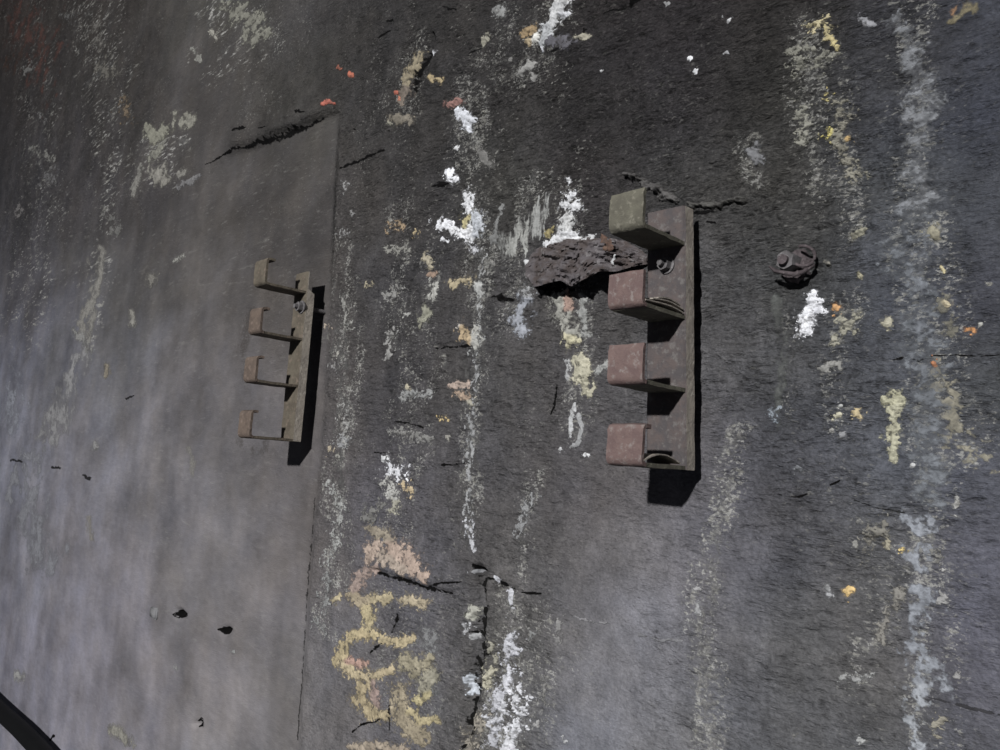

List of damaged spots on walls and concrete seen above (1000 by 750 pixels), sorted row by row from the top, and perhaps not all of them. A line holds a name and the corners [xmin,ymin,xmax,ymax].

leakage [508,0,592,82]
leakage [891,9,930,71]
crack [205,109,324,165]
crack [693,210,716,223]
leakage [364,279,406,303]
leakage [382,167,595,553]
leakage [786,289,863,373]
leakage [850,73,1000,750]
crack [370,614,399,653]
crack [377,564,542,750]
leakage [459,604,551,750]
crack [352,705,390,733]